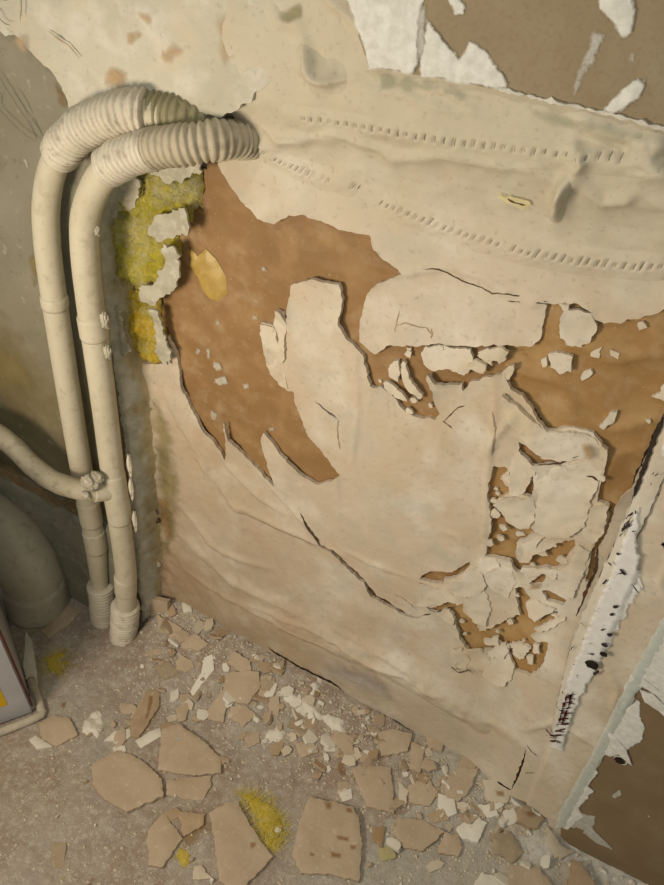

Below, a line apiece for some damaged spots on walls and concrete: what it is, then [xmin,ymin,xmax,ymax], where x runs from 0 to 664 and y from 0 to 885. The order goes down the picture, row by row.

crack [426,268,520,302]
flaking render [99,195,166,622]
water stain [156,411,175,549]
flaking render [161,161,664,687]
crack [234,511,452,616]
crack [498,746,537,790]